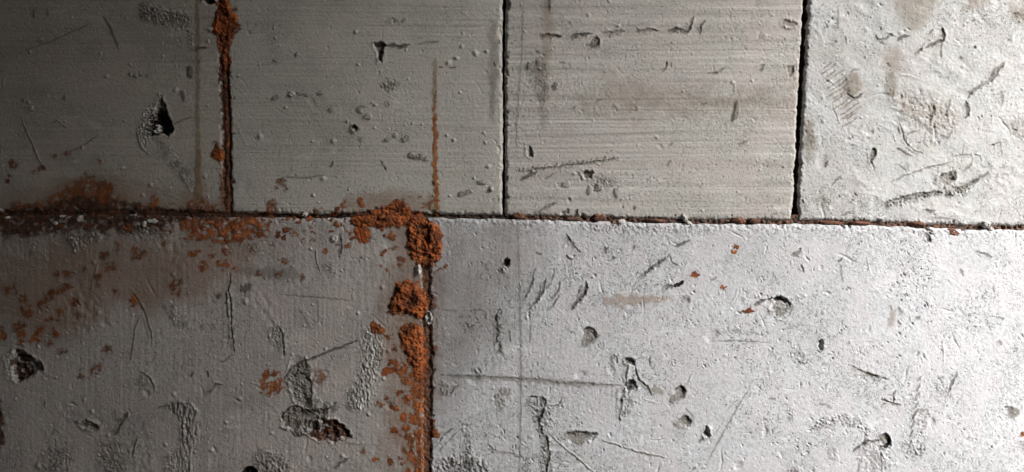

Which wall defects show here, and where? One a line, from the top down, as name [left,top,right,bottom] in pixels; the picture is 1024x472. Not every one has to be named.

spalling [137,96,193,183]
rust [0,0,449,472]
spalling [2,349,43,382]
spalling [281,330,382,441]